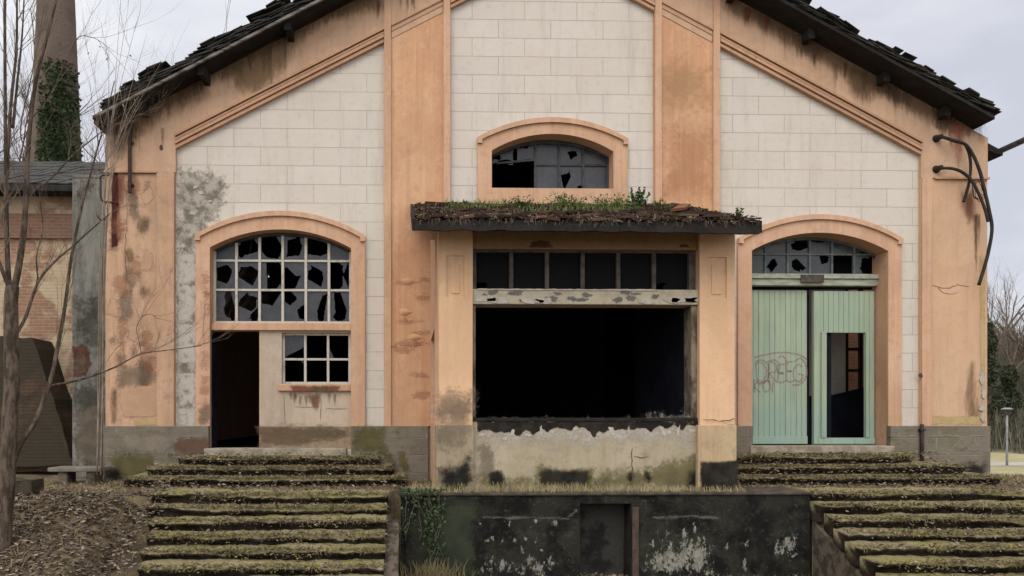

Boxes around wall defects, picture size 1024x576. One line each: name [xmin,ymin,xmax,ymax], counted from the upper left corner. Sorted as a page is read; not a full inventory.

damp [728,0,980,133]
corrosion [111,173,123,247]
corrosion [966,195,980,231]
peeling [117,171,228,454]
peeling [475,288,699,304]
peeling [477,421,698,451]
damp [439,456,536,491]
spalling [538,468,592,486]
damp [566,455,739,491]